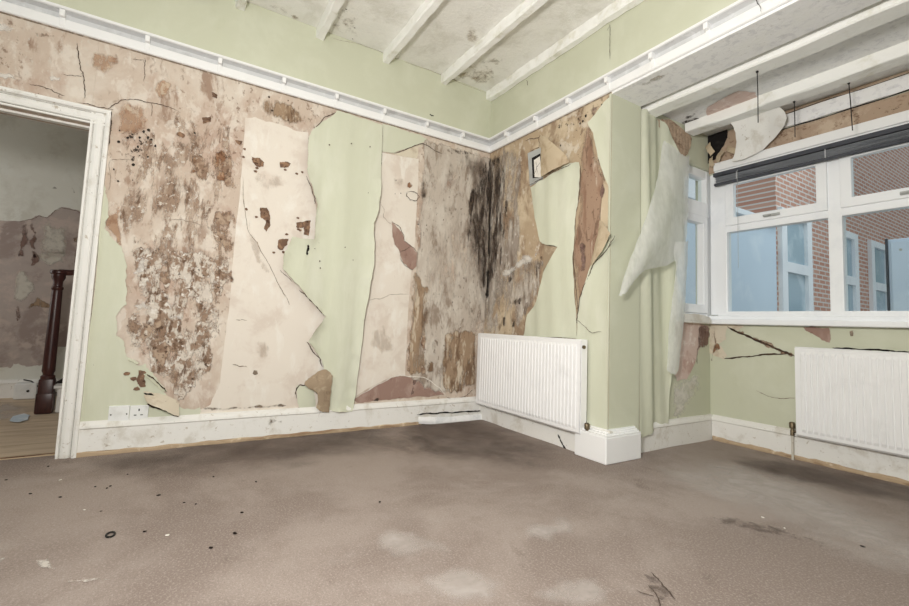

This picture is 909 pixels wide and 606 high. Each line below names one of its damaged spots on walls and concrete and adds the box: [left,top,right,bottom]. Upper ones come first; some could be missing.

crack [30,45,179,188]
spalling [706,91,757,116]
flaking render [763,70,909,150]
spalling [235,140,264,173]
spalling [708,129,737,175]
flaking render [0,207,81,368]
spalling [245,208,270,231]
spalling [272,217,311,254]
spalling [386,220,418,270]
damp [407,140,543,393]
flaking render [675,322,794,381]
spalling [354,375,444,403]